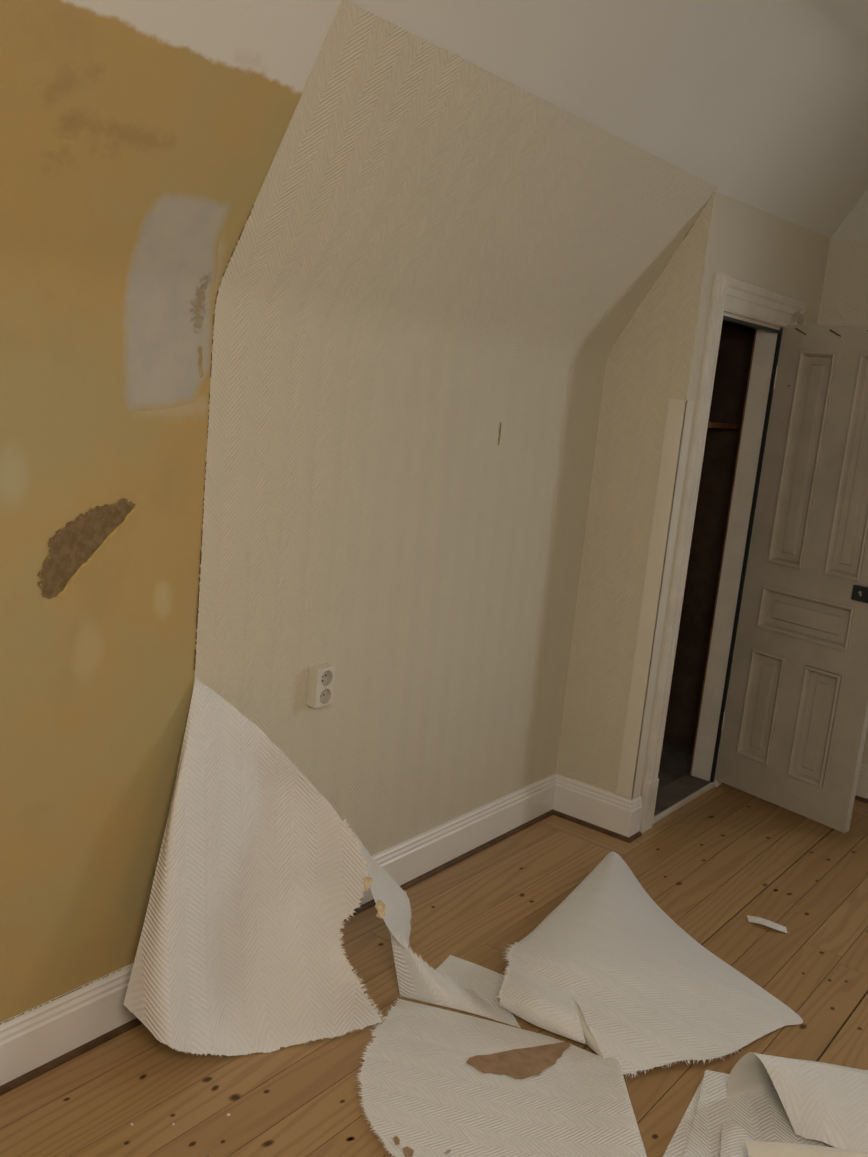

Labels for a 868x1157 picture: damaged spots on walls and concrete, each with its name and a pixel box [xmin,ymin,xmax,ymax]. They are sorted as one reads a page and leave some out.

peeling [37,498,138,599]